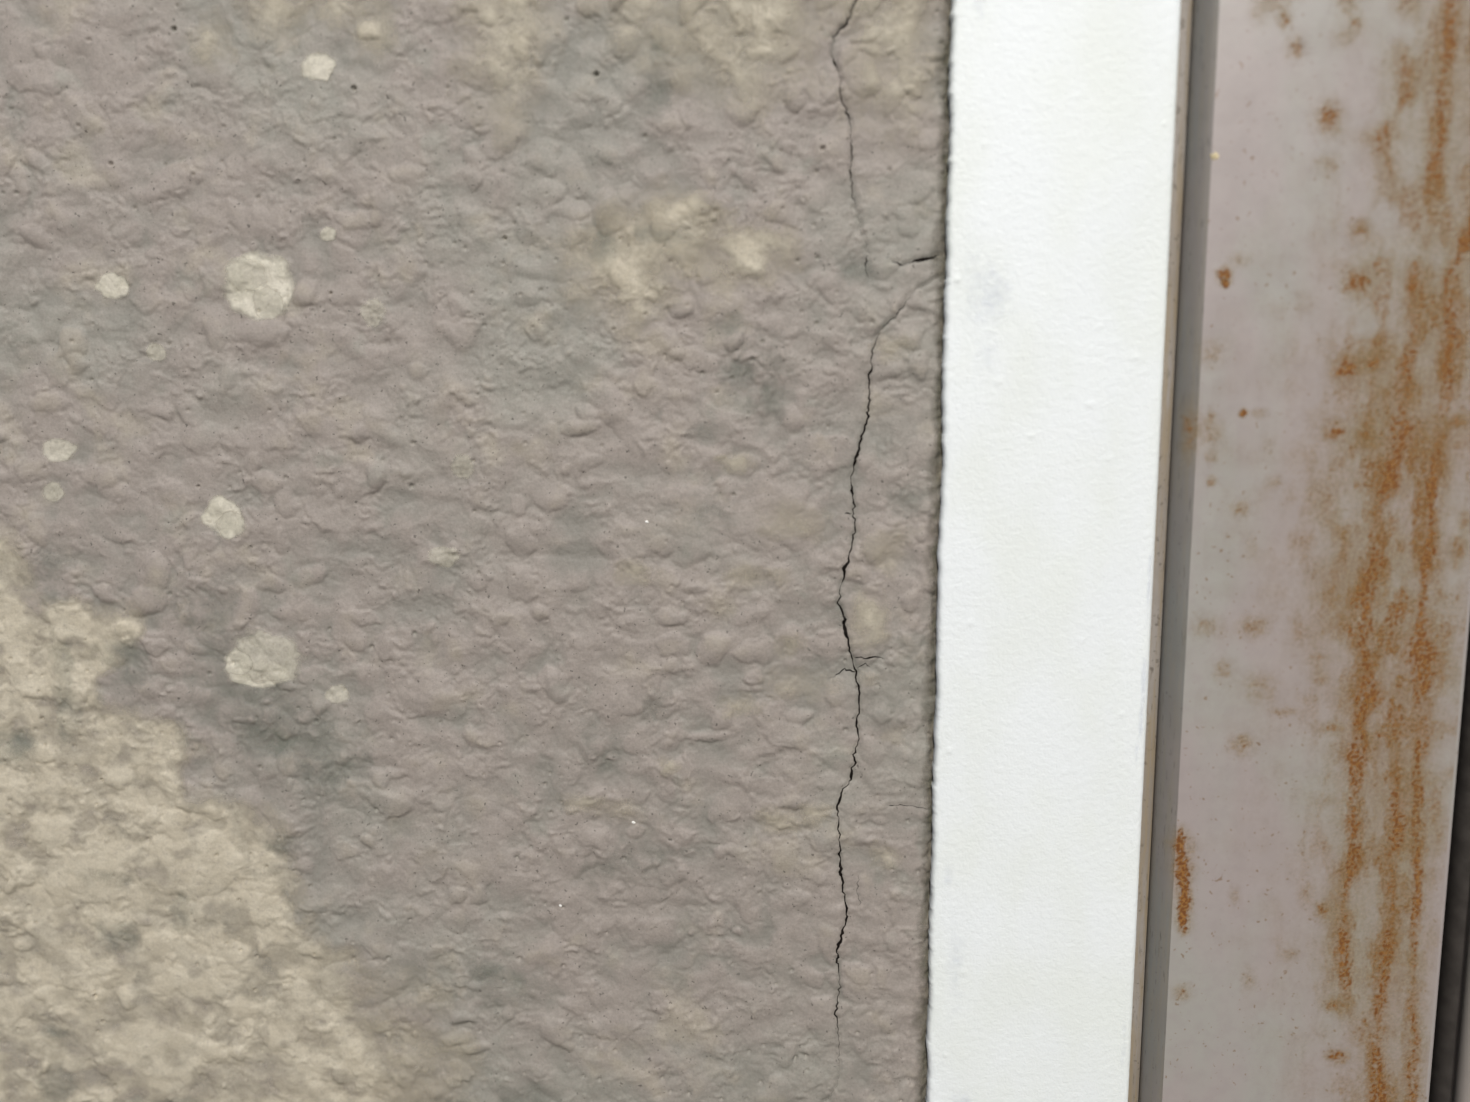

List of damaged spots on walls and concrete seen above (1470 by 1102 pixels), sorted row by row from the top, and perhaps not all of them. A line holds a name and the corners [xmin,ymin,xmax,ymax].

crack [828,0,940,1098]
rust [1173,828,1193,933]
rust [1217,268,1231,288]
rust [1317,0,1470,1102]